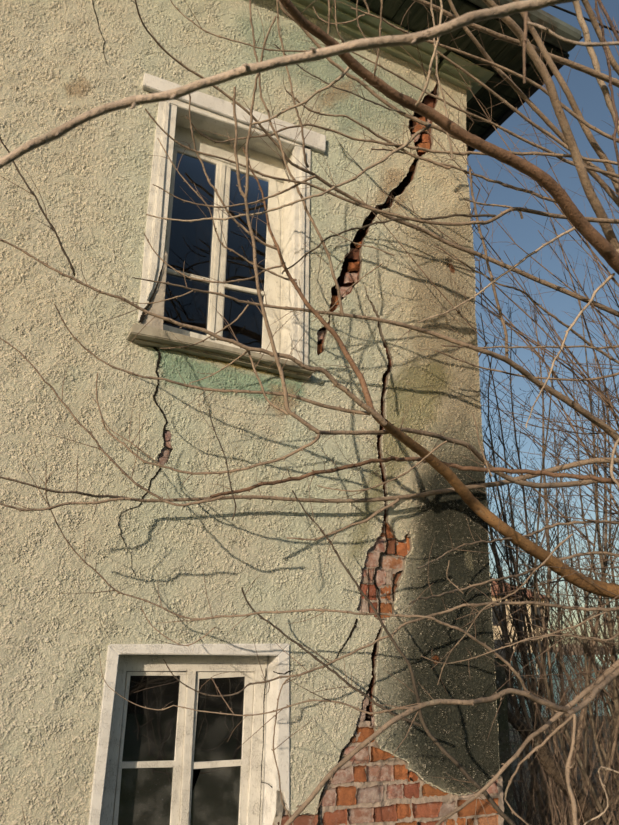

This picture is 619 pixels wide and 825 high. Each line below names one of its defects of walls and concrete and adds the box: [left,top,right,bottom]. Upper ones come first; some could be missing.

crack [317,79,438,355]
crack [118,468,161,576]
crack [373,309,392,526]
flaking render [357,521,410,619]
damp [435,431,487,507]
crack [334,619,358,660]
crack [357,619,385,729]
damp [385,466,500,793]
flaking render [272,721,504,825]